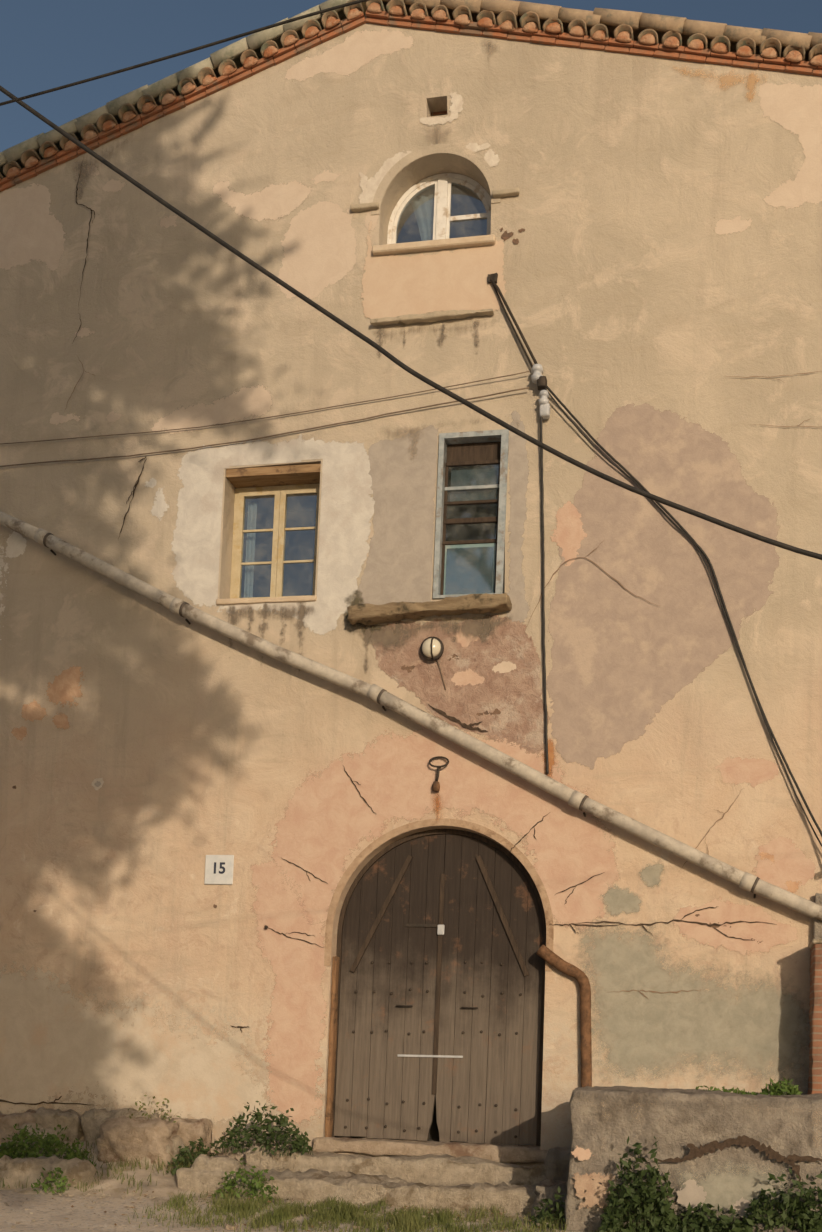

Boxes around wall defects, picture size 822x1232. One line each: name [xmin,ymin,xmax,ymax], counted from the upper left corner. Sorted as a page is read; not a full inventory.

crack [65,154,95,409]
crack [118,457,147,539]
peeling [0,531,27,643]
crack [269,928,323,948]
crack [283,859,328,884]
peeling [0,614,620,1134]
crack [551,873,777,940]